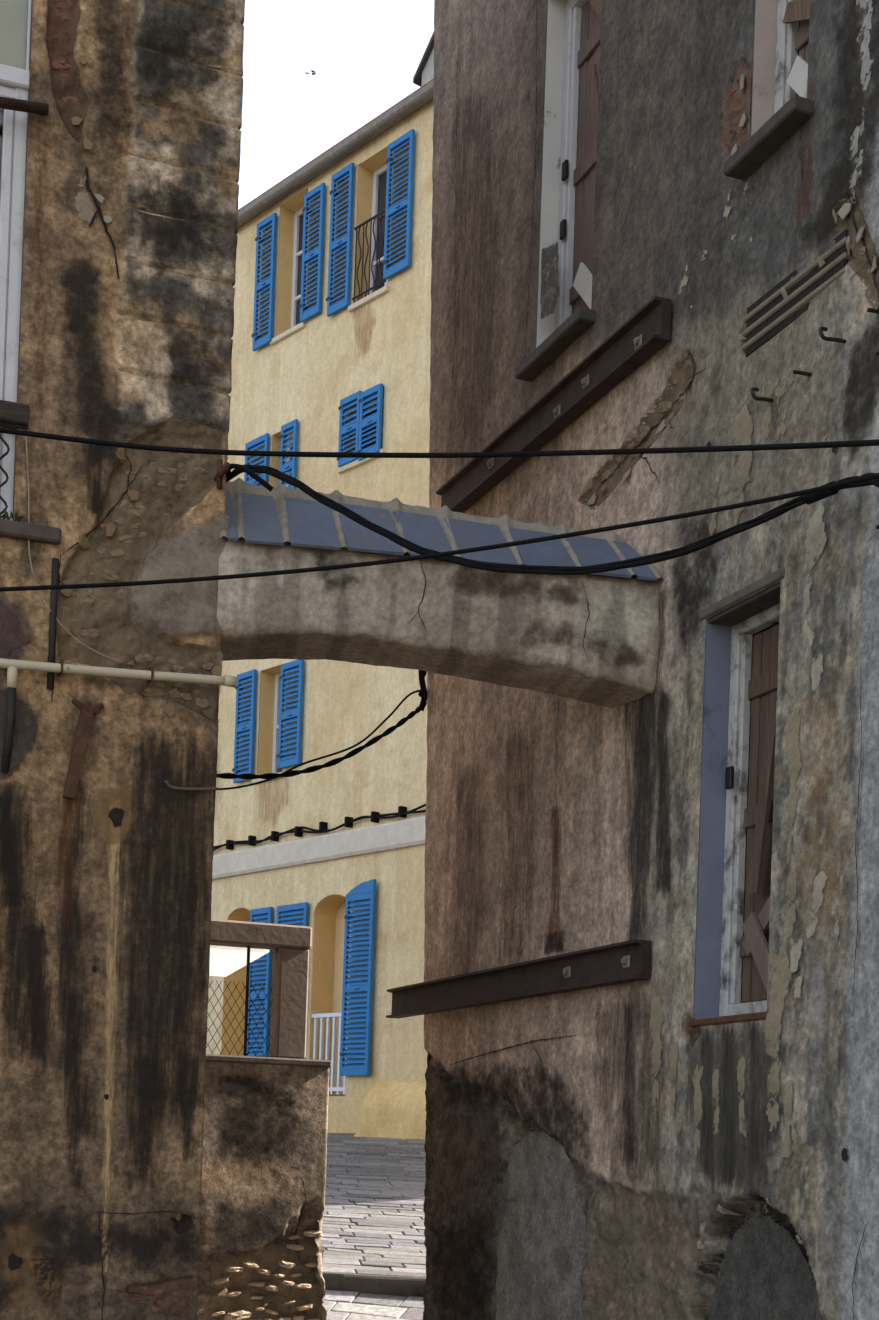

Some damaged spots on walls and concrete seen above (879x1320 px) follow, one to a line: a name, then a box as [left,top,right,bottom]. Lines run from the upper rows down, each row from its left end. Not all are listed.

water stain [142,20,225,103]
spalling [720,58,751,164]
peeling [856,0,873,91]
crack [75,166,120,279]
water stain [137,183,220,277]
spalling [740,107,879,357]
spalling [578,349,697,510]
water stain [625,671,670,940]
peeling [764,707,843,1158]
water stain [0,689,302,1304]
water stain [430,1064,589,1159]
peeling [692,1063,720,1155]